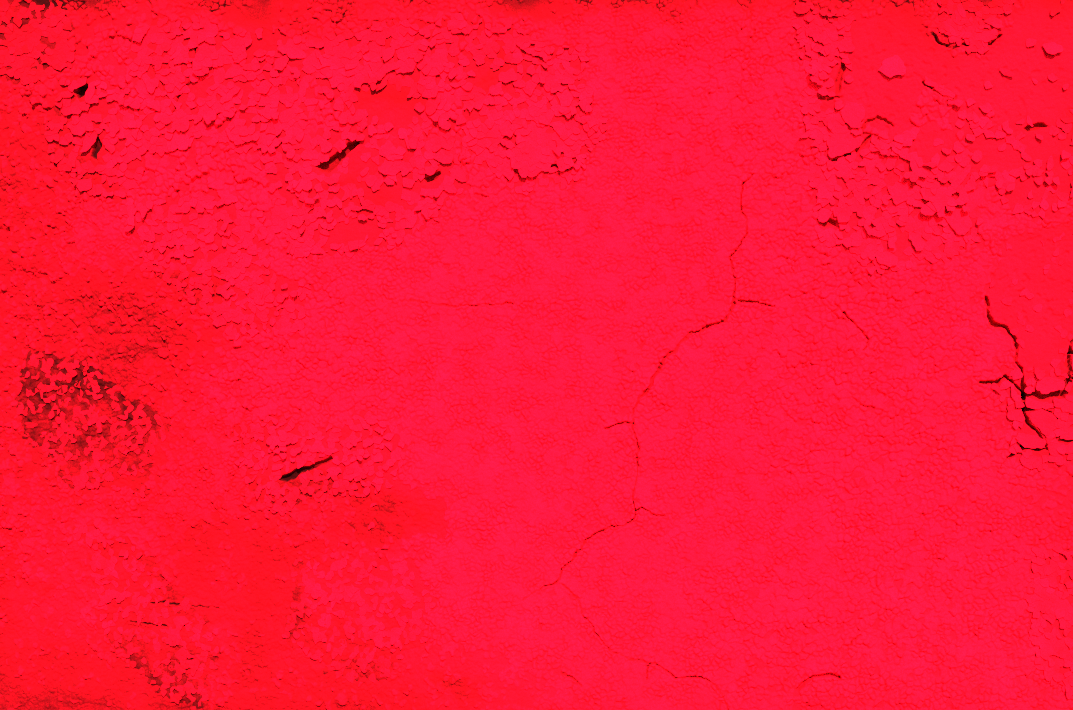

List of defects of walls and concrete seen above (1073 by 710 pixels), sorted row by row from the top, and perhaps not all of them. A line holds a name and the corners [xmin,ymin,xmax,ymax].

peeling [0,0,609,340]
peeling [231,411,449,551]
crack [522,173,775,710]
peeling [789,0,1073,473]
crack [978,295,1073,459]